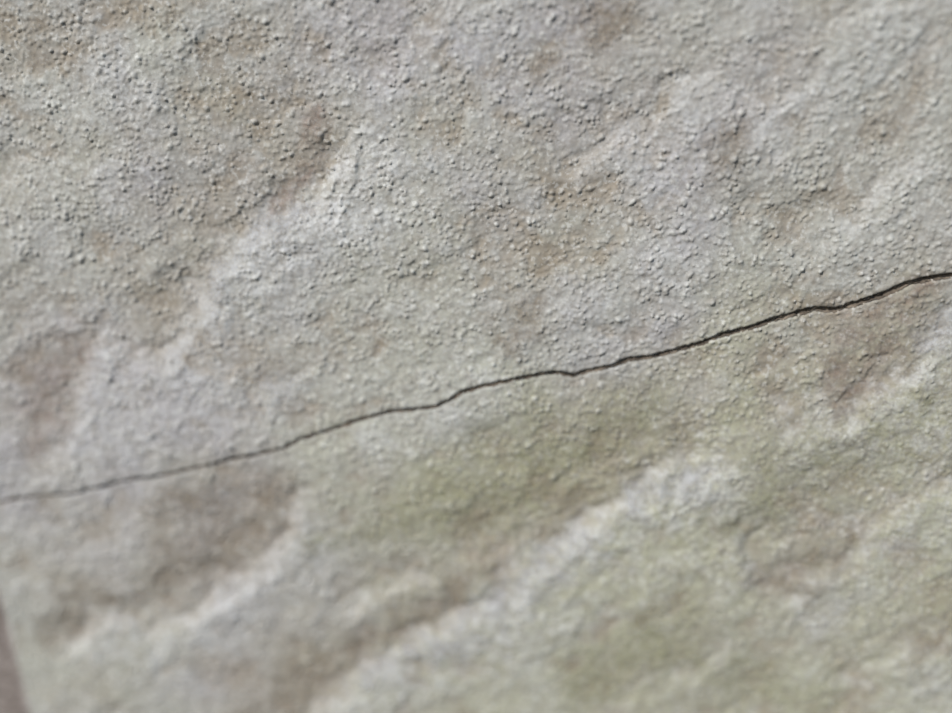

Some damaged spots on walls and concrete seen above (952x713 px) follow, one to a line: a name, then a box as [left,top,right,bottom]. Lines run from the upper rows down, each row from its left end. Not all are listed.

crack [0,273,952,503]